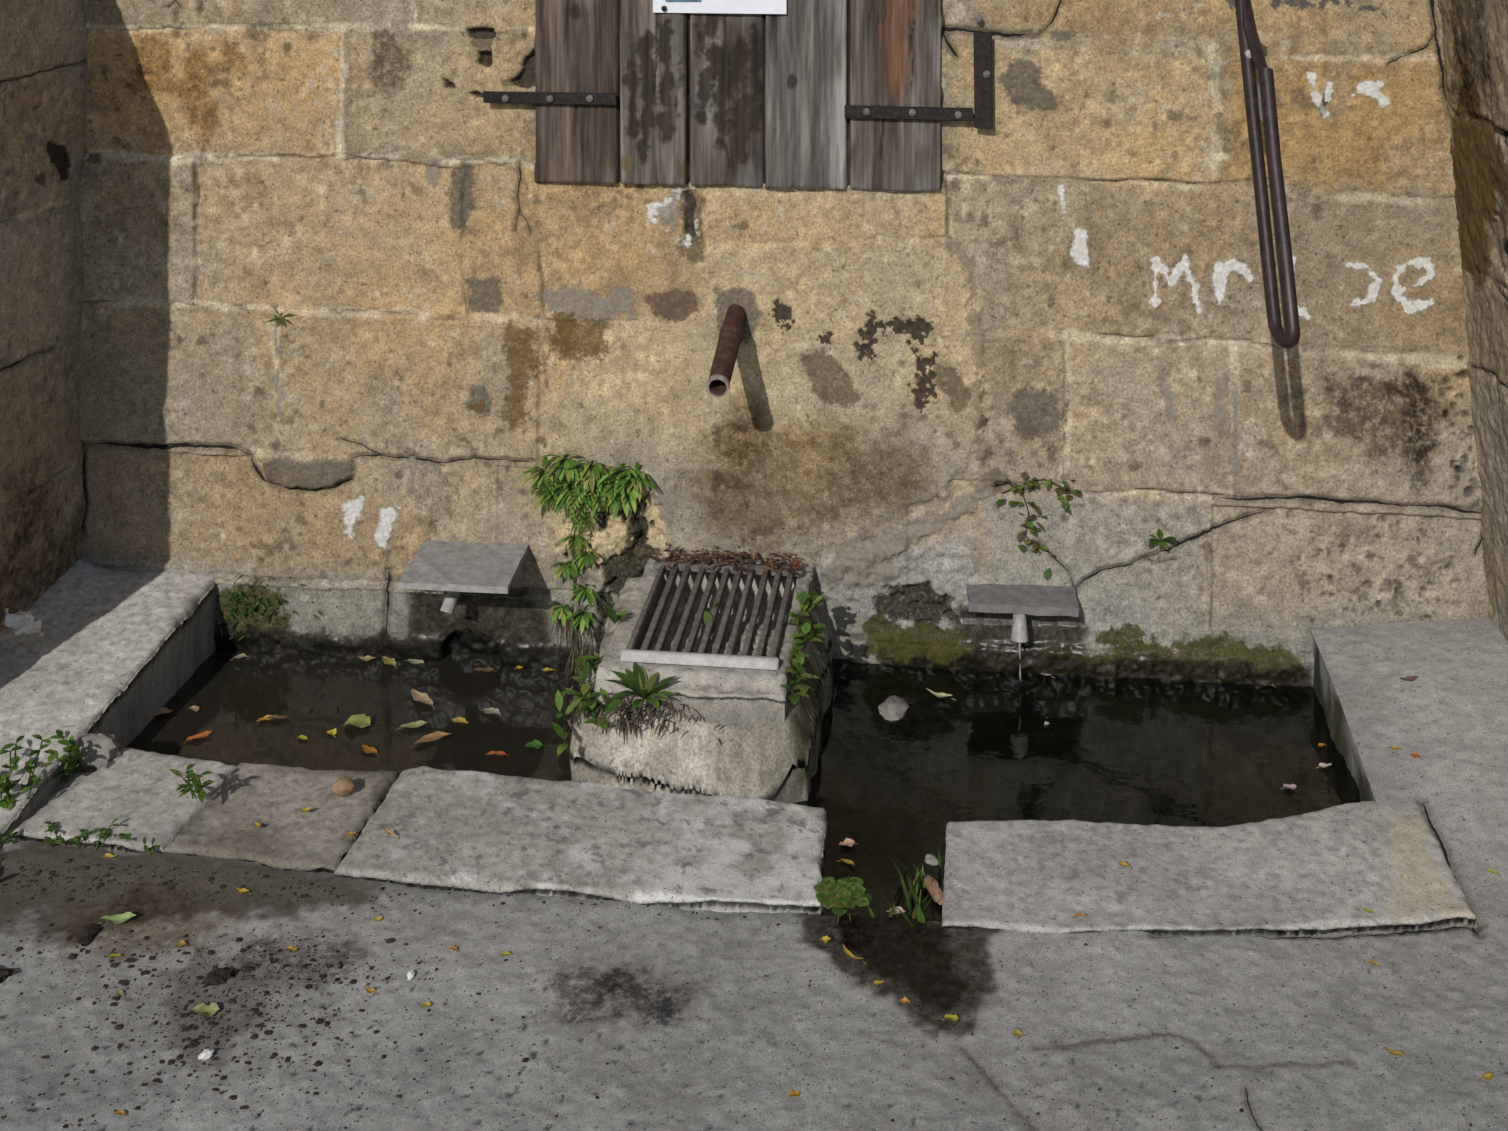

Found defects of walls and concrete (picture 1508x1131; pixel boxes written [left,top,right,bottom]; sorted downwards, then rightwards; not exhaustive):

spalling [657,191,705,263]
spalling [646,288,698,321]
crack [0,350,48,371]
crack [82,438,529,535]
crack [1035,496,1482,587]
leakage [803,912,1002,1031]
crack [1036,1033,1356,1131]